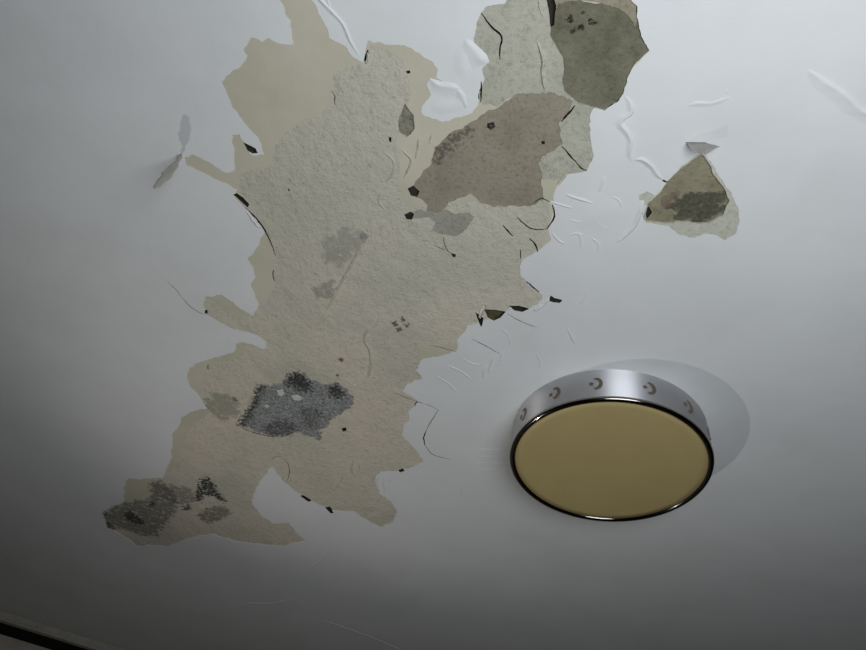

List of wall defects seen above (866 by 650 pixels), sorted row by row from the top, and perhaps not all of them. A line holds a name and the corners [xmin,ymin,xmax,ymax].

spalling [639,142,740,240]
peeling [103,0,649,546]
leakage [204,372,354,440]
leakage [103,476,229,537]